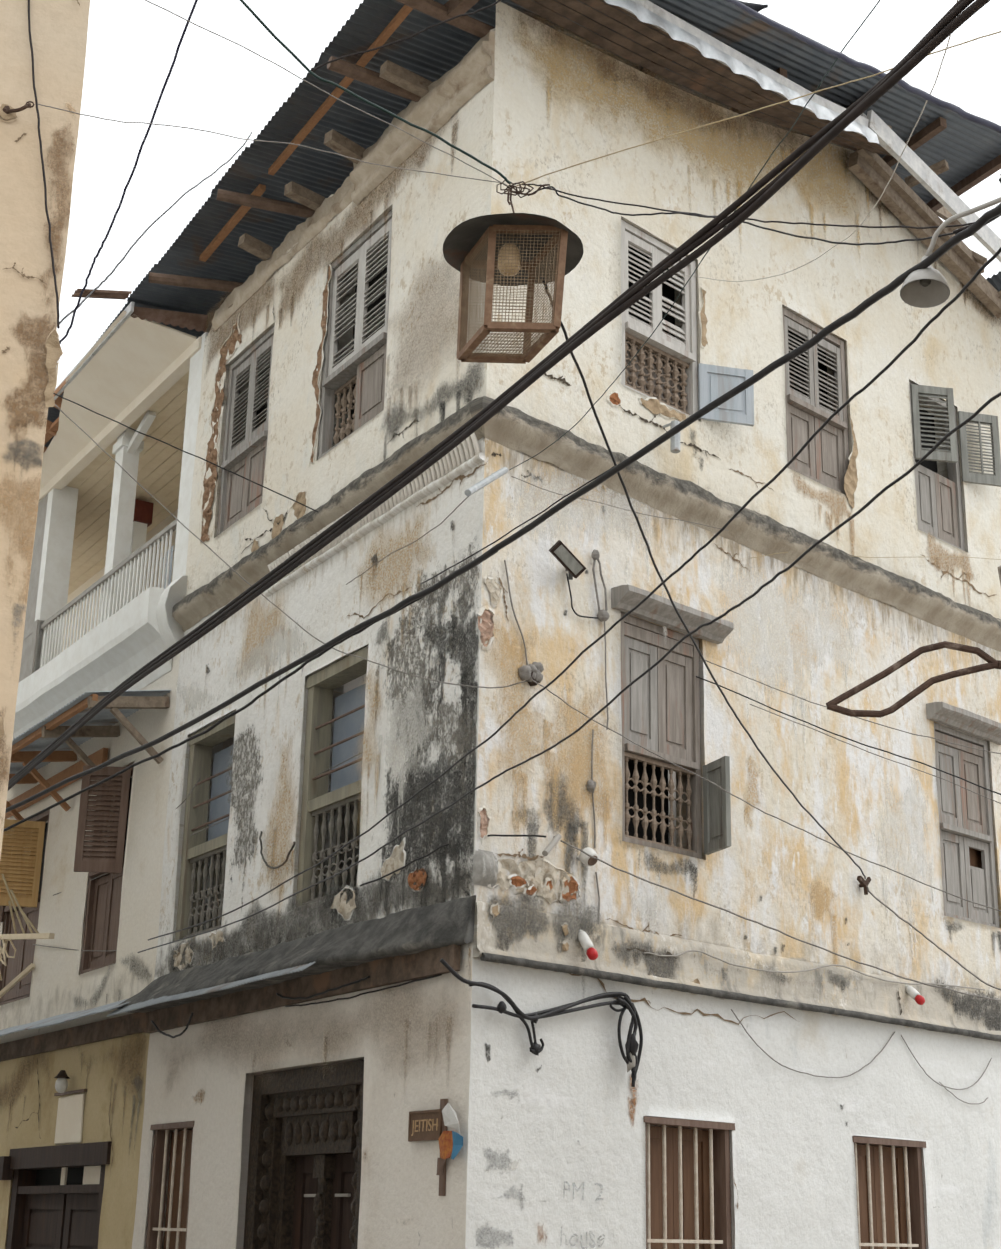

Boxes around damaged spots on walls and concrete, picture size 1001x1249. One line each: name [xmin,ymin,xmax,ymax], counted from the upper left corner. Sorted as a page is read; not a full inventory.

leakage [42,128,73,301]
leakage [5,315,55,467]
spalling [200,313,242,544]
spalling [309,264,332,467]
leakage [171,538,480,973]
spalling [487,858,581,918]
crack [554,971,799,1025]
leakage [936,980,1001,1031]